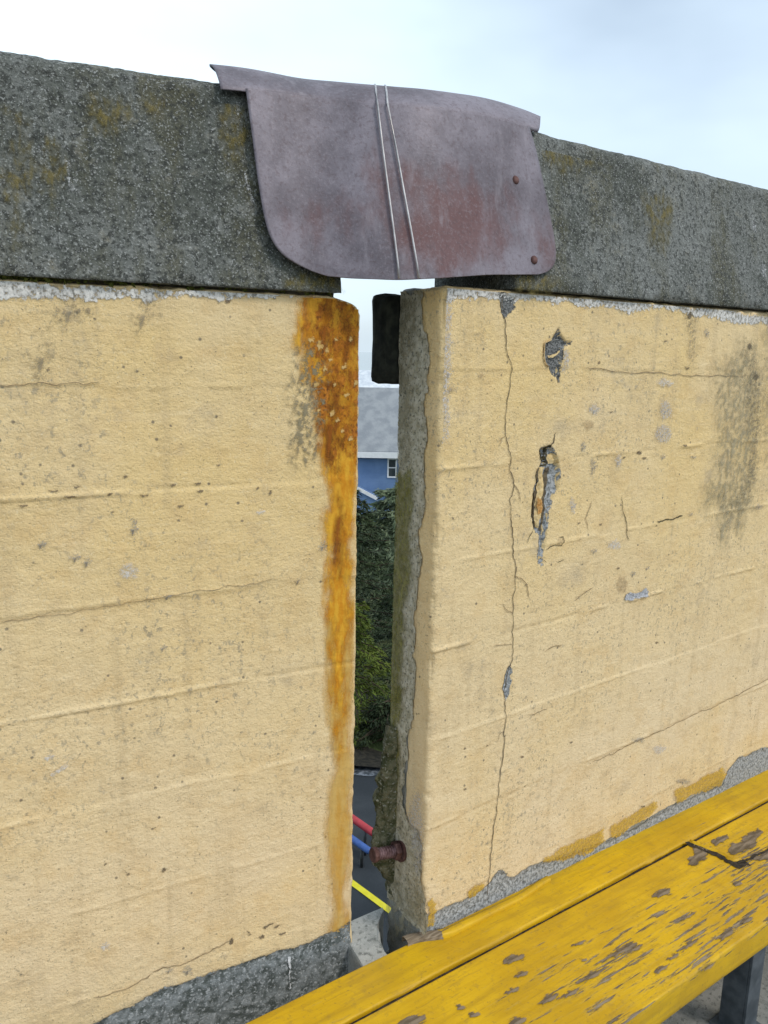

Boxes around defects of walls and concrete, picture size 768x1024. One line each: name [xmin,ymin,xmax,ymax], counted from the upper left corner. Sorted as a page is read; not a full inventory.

crack [94,941,229,998]
corrosion [288,274,359,938]
crack [487,292,529,895]
peeling [370,288,768,935]
crack [595,679,768,761]
damp [708,350,761,544]